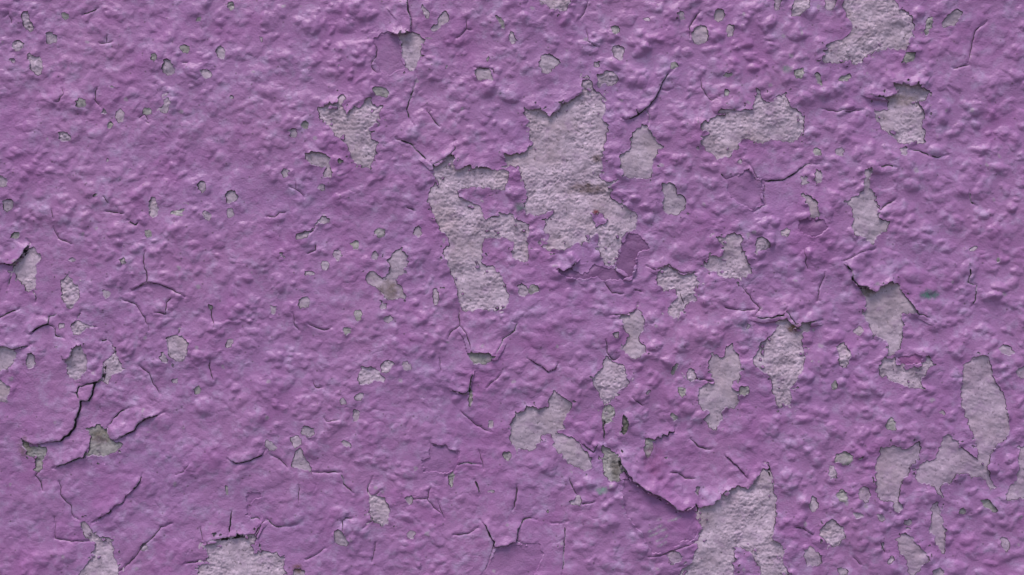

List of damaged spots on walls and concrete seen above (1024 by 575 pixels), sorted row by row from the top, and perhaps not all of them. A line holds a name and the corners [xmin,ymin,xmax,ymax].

peeling [289,87,389,190]
peeling [419,62,770,364]
crack [622,70,666,119]
peeling [697,73,804,210]
peeling [844,167,890,250]
peeling [794,0,962,155]
peeling [671,286,823,430]
peeling [837,282,939,390]
crack [19,339,159,542]
peeling [198,492,305,575]
peeling [503,391,791,575]
peeling [829,352,1024,575]